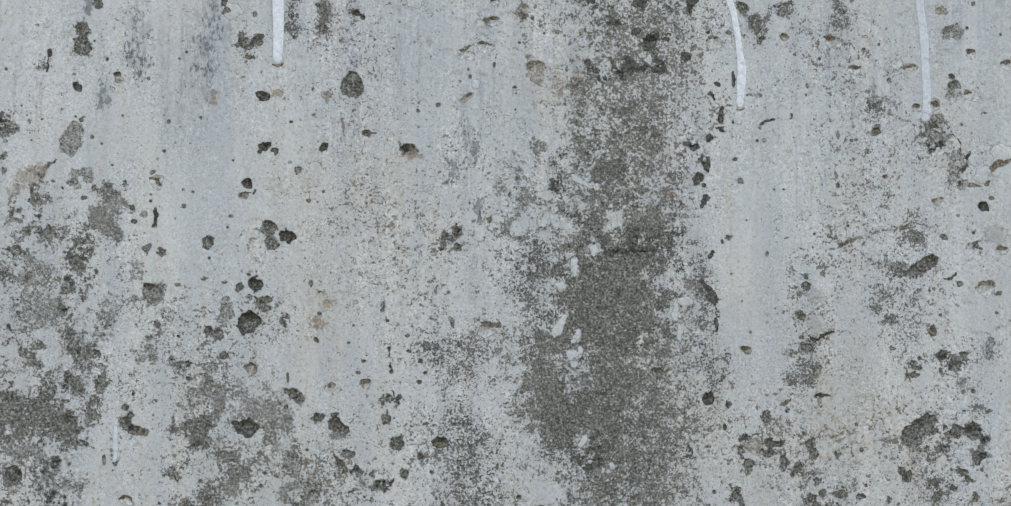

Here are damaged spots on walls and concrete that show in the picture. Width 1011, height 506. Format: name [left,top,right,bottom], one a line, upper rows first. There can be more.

water stain [401,0,735,506]